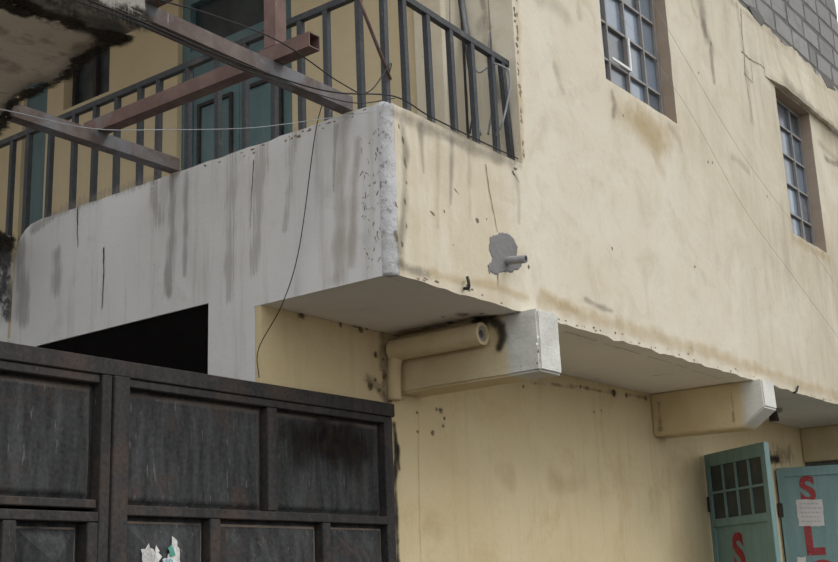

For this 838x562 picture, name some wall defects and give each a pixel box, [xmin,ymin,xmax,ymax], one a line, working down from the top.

crack [741,16,765,118]
water stain [443,313,506,351]